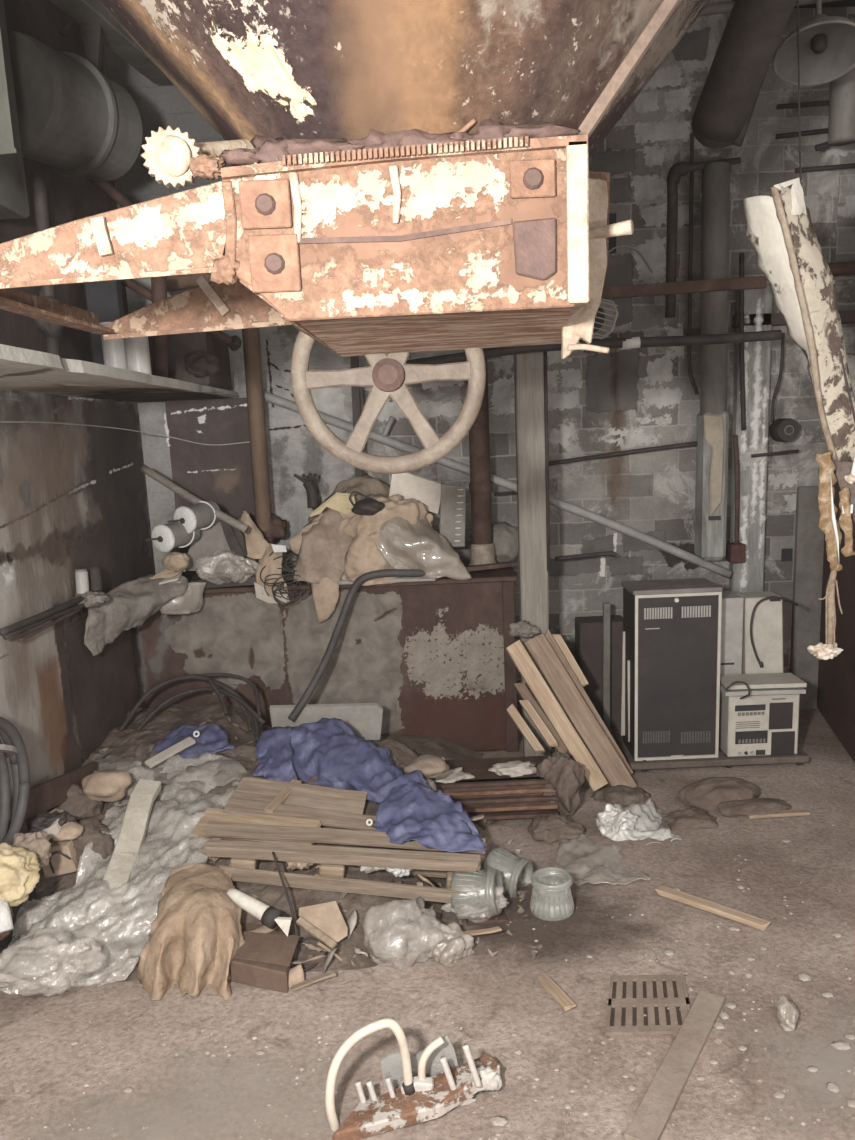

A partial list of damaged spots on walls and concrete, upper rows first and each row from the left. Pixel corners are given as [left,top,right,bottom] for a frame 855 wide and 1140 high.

rust [609,333,623,501]
leakage [0,385,228,774]
rust [249,648,267,694]
peeling [138,590,505,735]
rust [410,687,506,749]